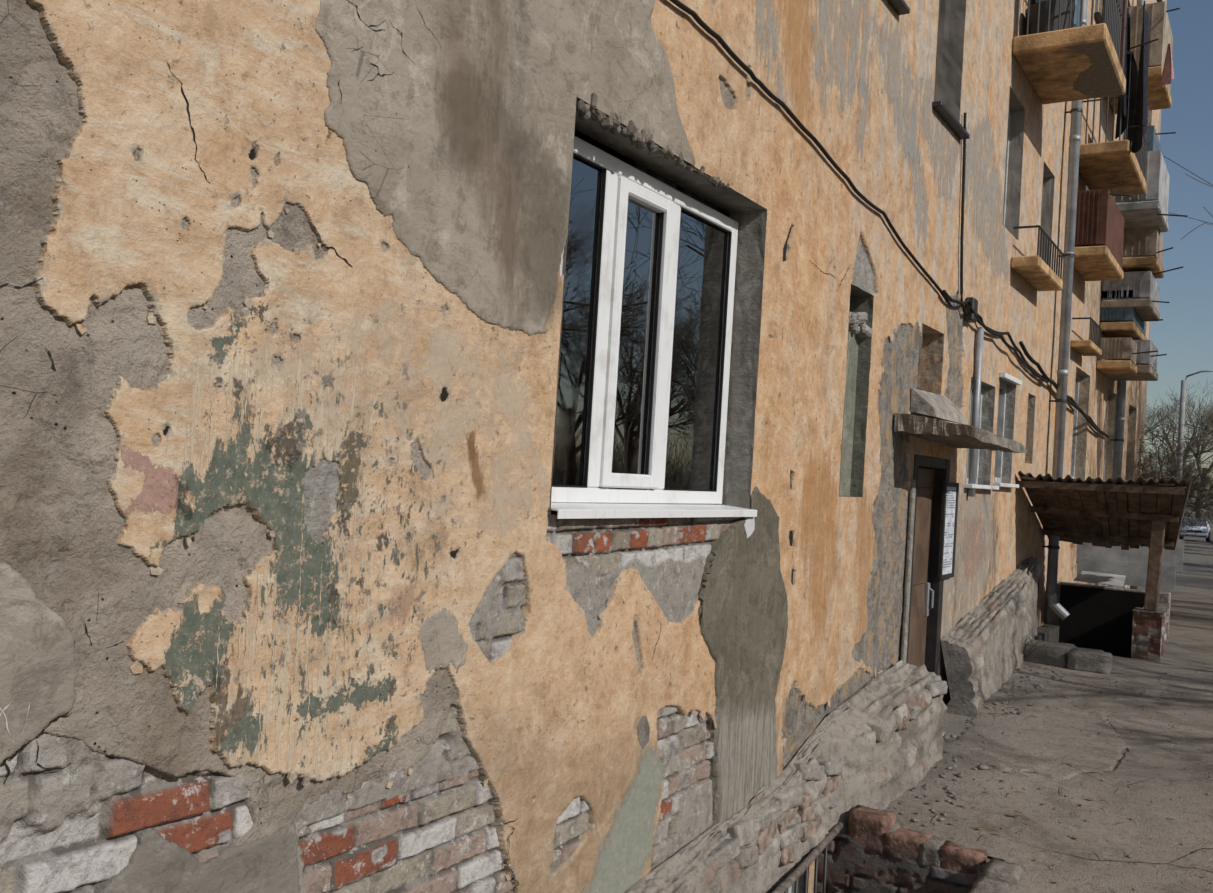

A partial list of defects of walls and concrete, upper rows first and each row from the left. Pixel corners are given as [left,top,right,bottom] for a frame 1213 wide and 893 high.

crack [338,1,442,103]
crack [167,62,210,183]
spalling [576,93,730,190]
flaking render [0,0,514,893]
flaking render [469,553,526,663]
flaking render [546,515,742,636]
flaking render [550,797,589,873]
flaking render [650,706,717,872]
crack [1029,844,1213,872]